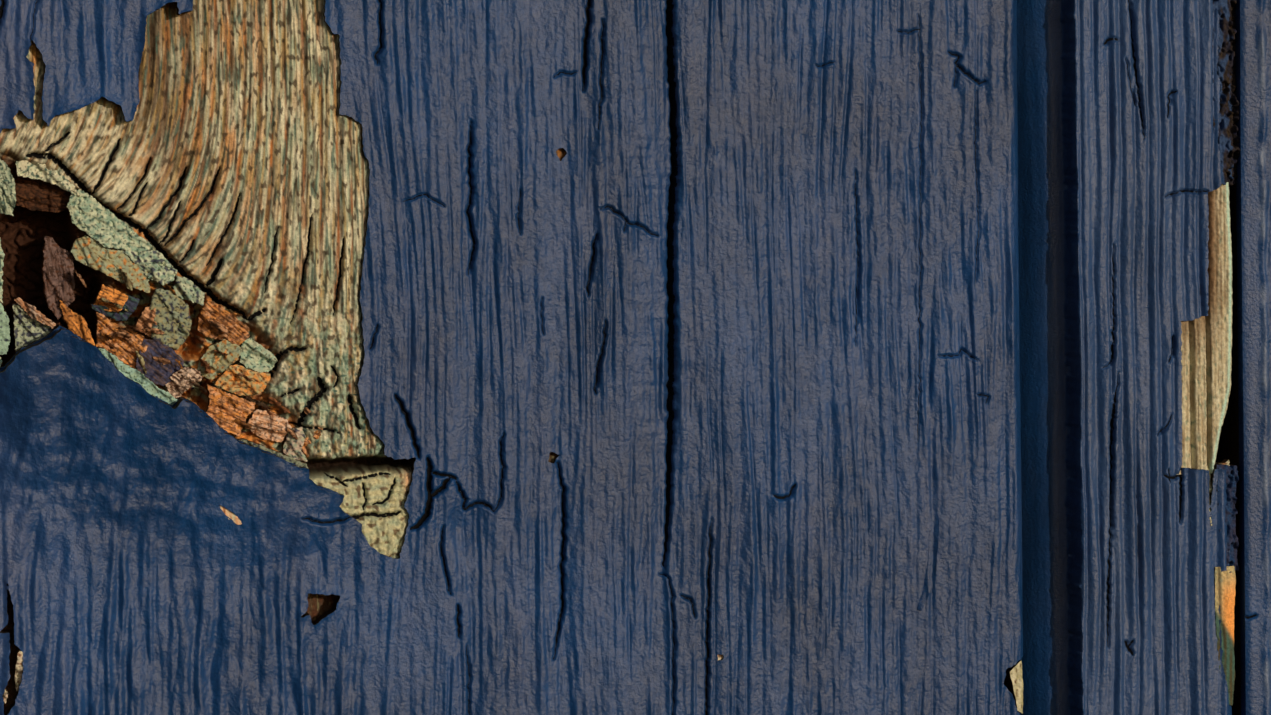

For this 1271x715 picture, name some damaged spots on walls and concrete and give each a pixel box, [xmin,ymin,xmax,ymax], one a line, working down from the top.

peeling [0,0,412,558]
peeling [1176,0,1240,705]
peeling [306,593,337,621]
crack [302,516,352,524]
crack [395,394,505,715]